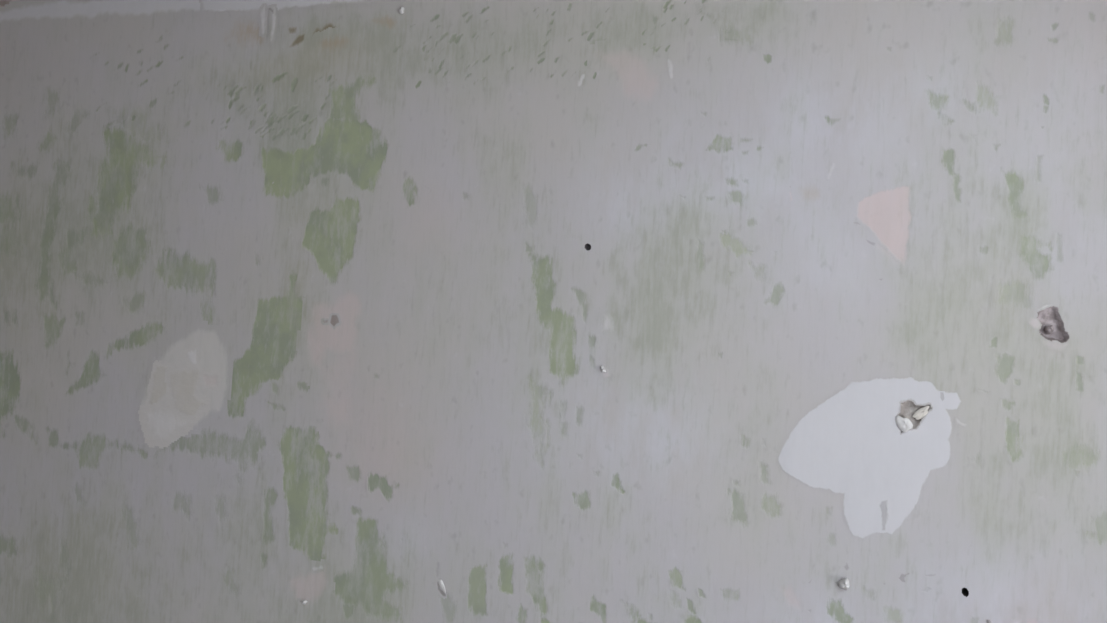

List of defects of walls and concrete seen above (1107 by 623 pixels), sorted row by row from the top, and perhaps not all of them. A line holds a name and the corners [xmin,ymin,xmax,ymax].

peeling [895,406,929,433]